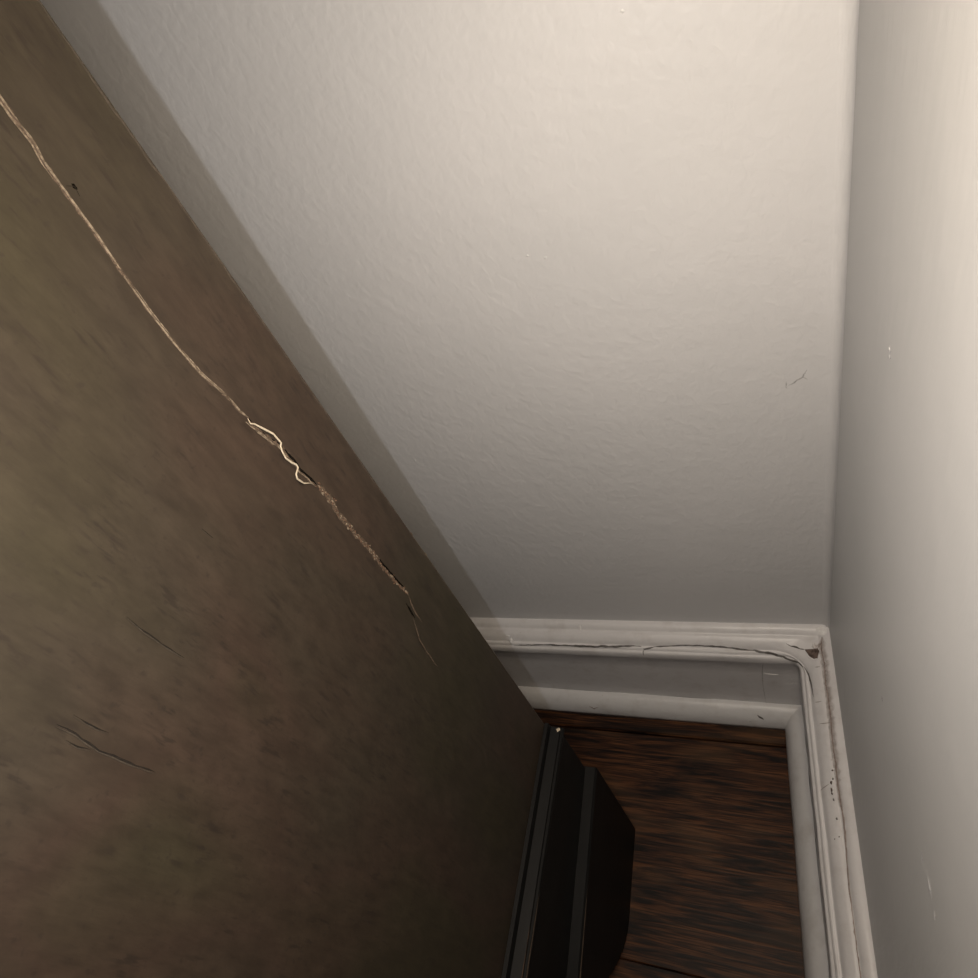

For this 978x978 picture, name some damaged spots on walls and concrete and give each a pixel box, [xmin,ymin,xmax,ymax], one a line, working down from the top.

crack [0,95,438,667]
crack [520,639,861,978]